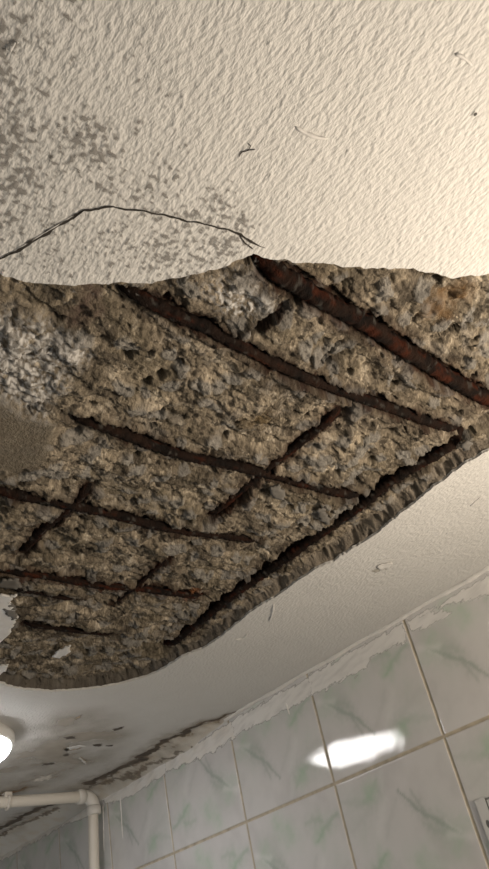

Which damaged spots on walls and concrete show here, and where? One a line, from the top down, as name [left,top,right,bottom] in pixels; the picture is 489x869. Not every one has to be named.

crack [0,206,264,259]
spalling [0,1,489,690]
corrosion [250,254,489,407]
corrosion [70,284,465,646]
corrosion [0,483,261,552]
corrosion [0,559,203,602]
corrosion [23,620,113,636]
damp [81,712,235,788]
damp [0,804,60,836]